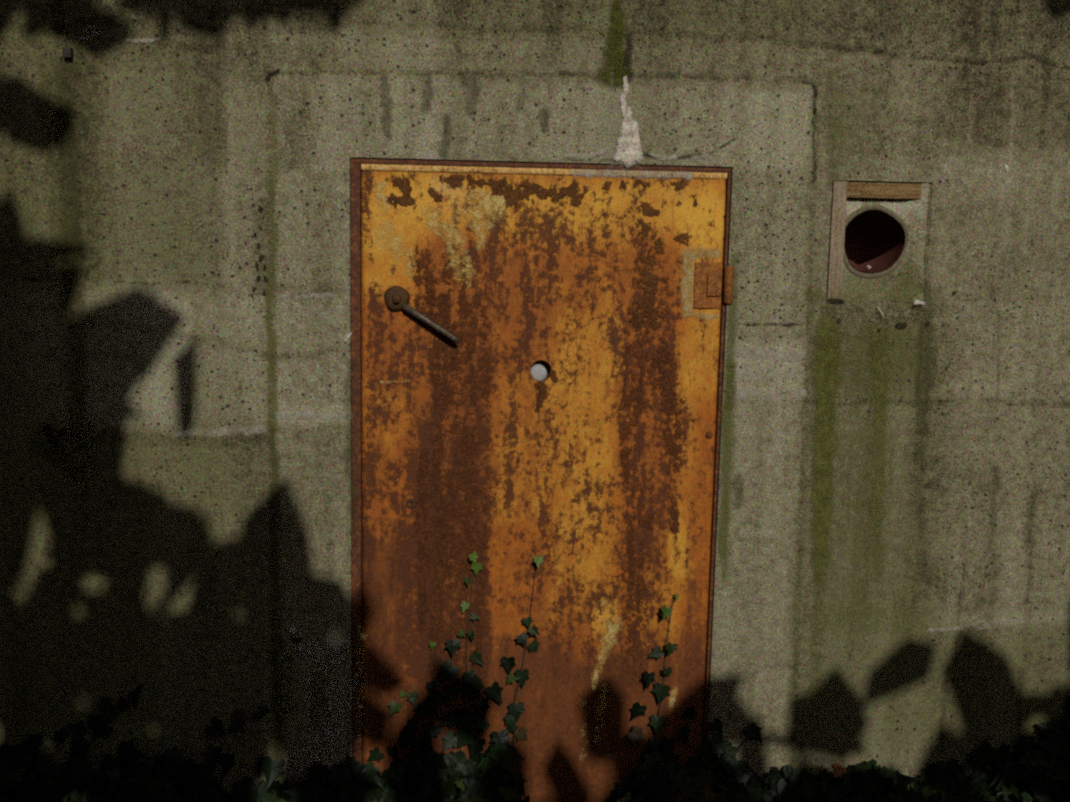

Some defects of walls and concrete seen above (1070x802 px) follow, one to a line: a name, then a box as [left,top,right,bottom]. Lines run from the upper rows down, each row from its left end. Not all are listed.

leakage [573,30,693,179]
rust [385,173,588,208]
rust [602,177,651,190]
rust [671,175,698,206]
rust [410,243,493,737]
rust [534,370,559,413]
rust [618,202,695,689]
leakage [724,312,840,584]